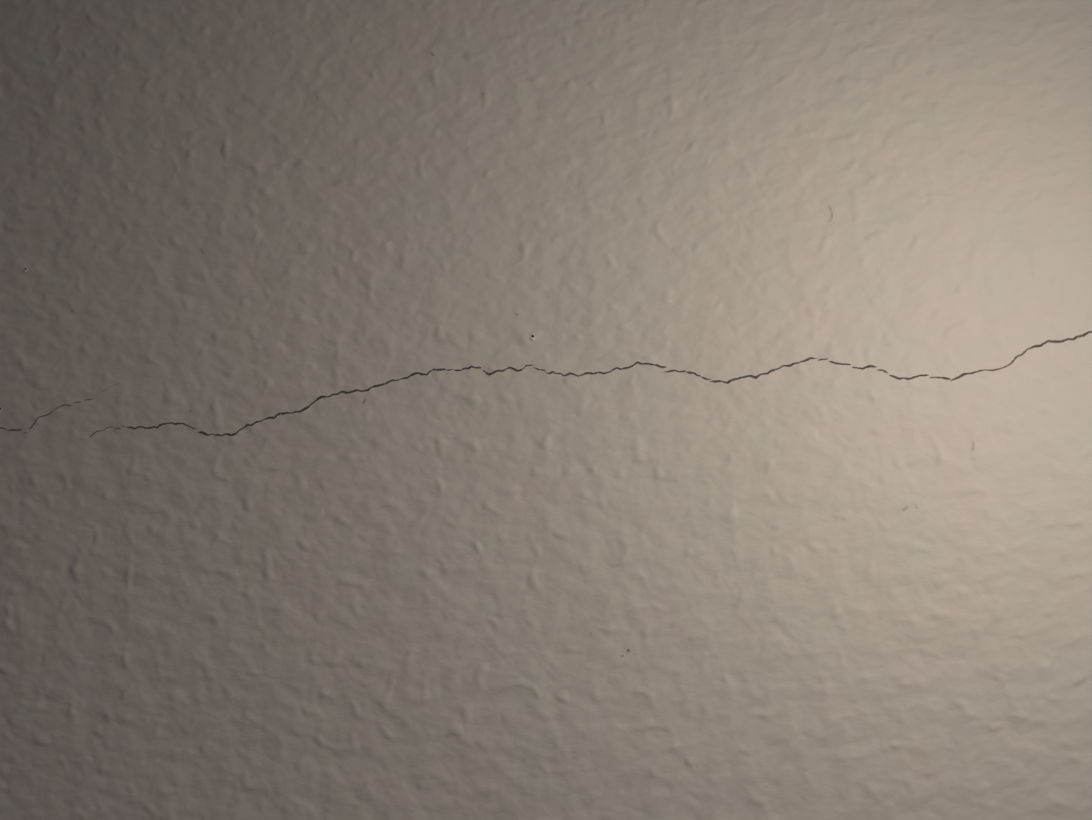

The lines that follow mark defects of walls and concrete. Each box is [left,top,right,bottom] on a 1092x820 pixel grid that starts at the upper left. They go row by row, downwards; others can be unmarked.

crack [0,383,119,435]
crack [89,330,1092,439]